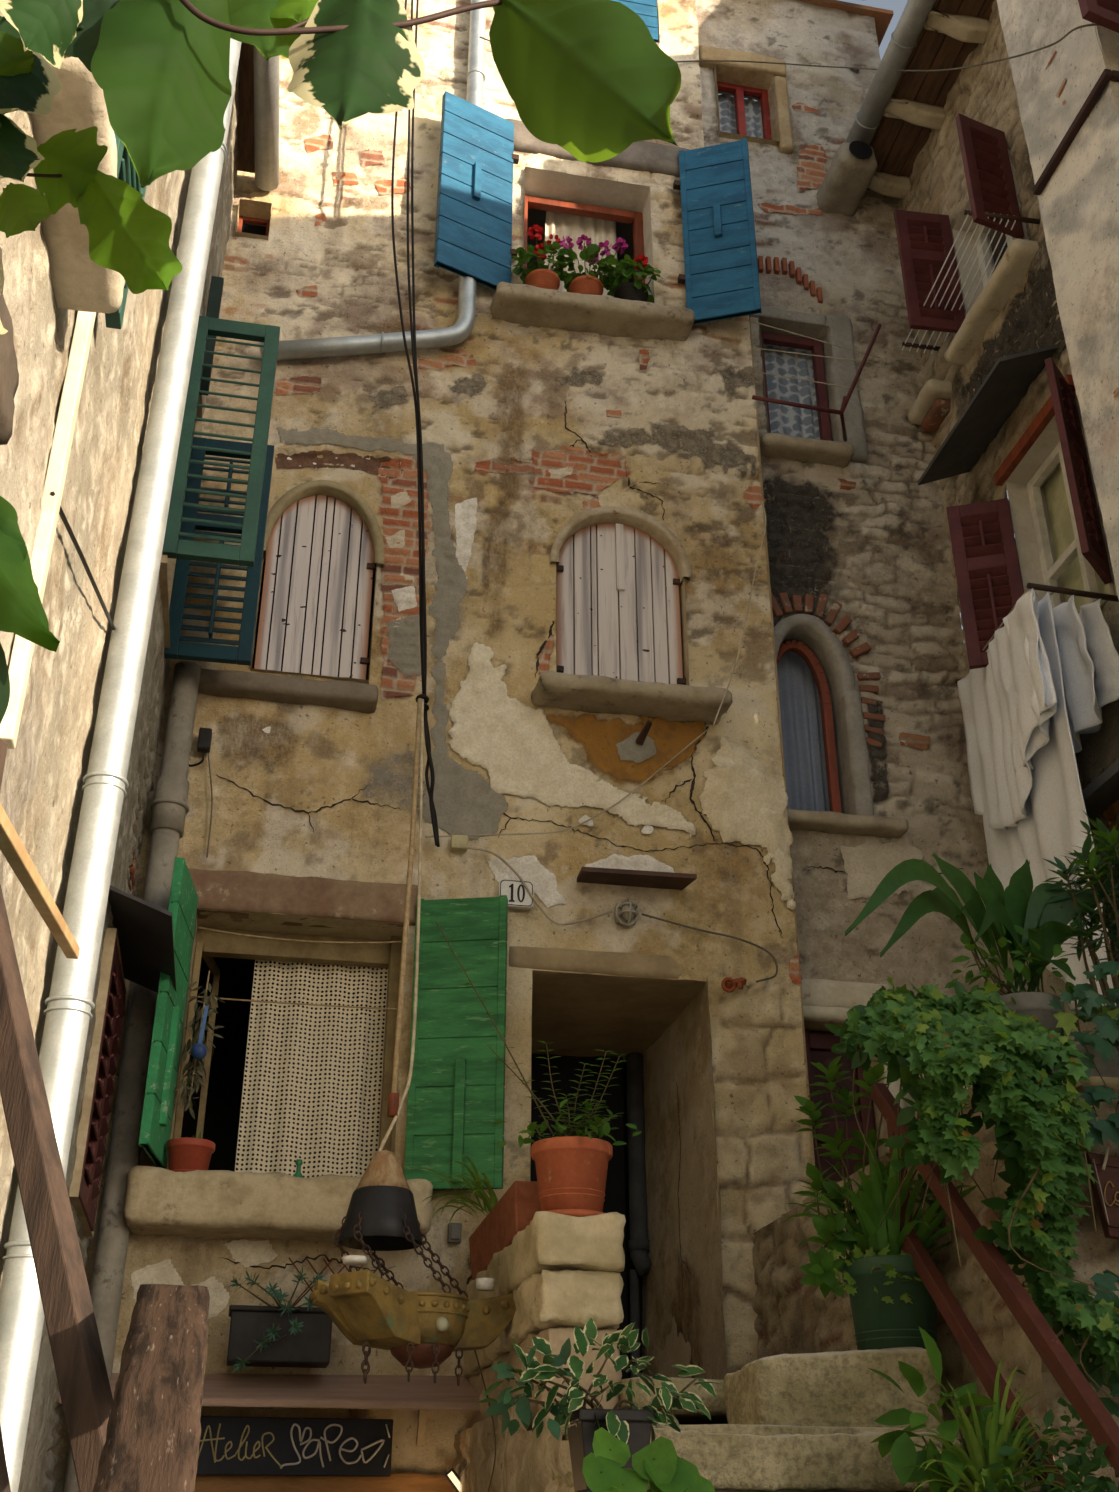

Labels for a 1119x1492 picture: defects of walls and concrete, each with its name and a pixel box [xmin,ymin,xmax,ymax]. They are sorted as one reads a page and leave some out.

spalling [474,410,766,510]
spalling [275,450,429,700]
crack [216,774,400,832]
flaking render [449,642,696,838]
flaking render [584,854,675,873]
crack [498,726,783,938]